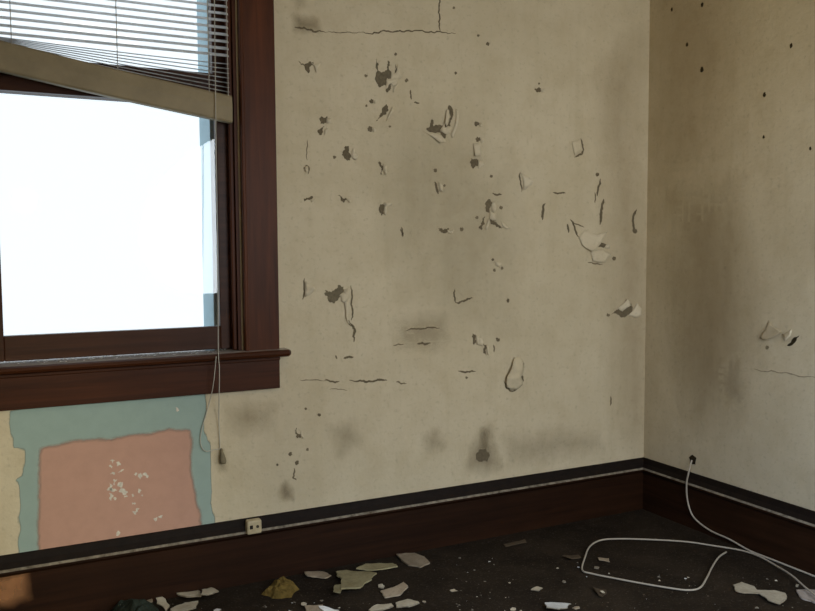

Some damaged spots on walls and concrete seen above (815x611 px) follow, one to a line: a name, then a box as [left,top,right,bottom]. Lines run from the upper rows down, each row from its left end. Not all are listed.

crack [295,0,455,35]
spalling [364,53,419,104]
spalling [317,116,331,135]
spalling [365,99,394,132]
peeling [424,105,459,143]
spalling [333,146,358,161]
peeling [470,137,484,169]
peeling [475,193,509,230]
peeling [567,219,616,265]
peeling [324,285,356,341]
peeling [607,299,642,318]
flaking render [9,394,215,553]